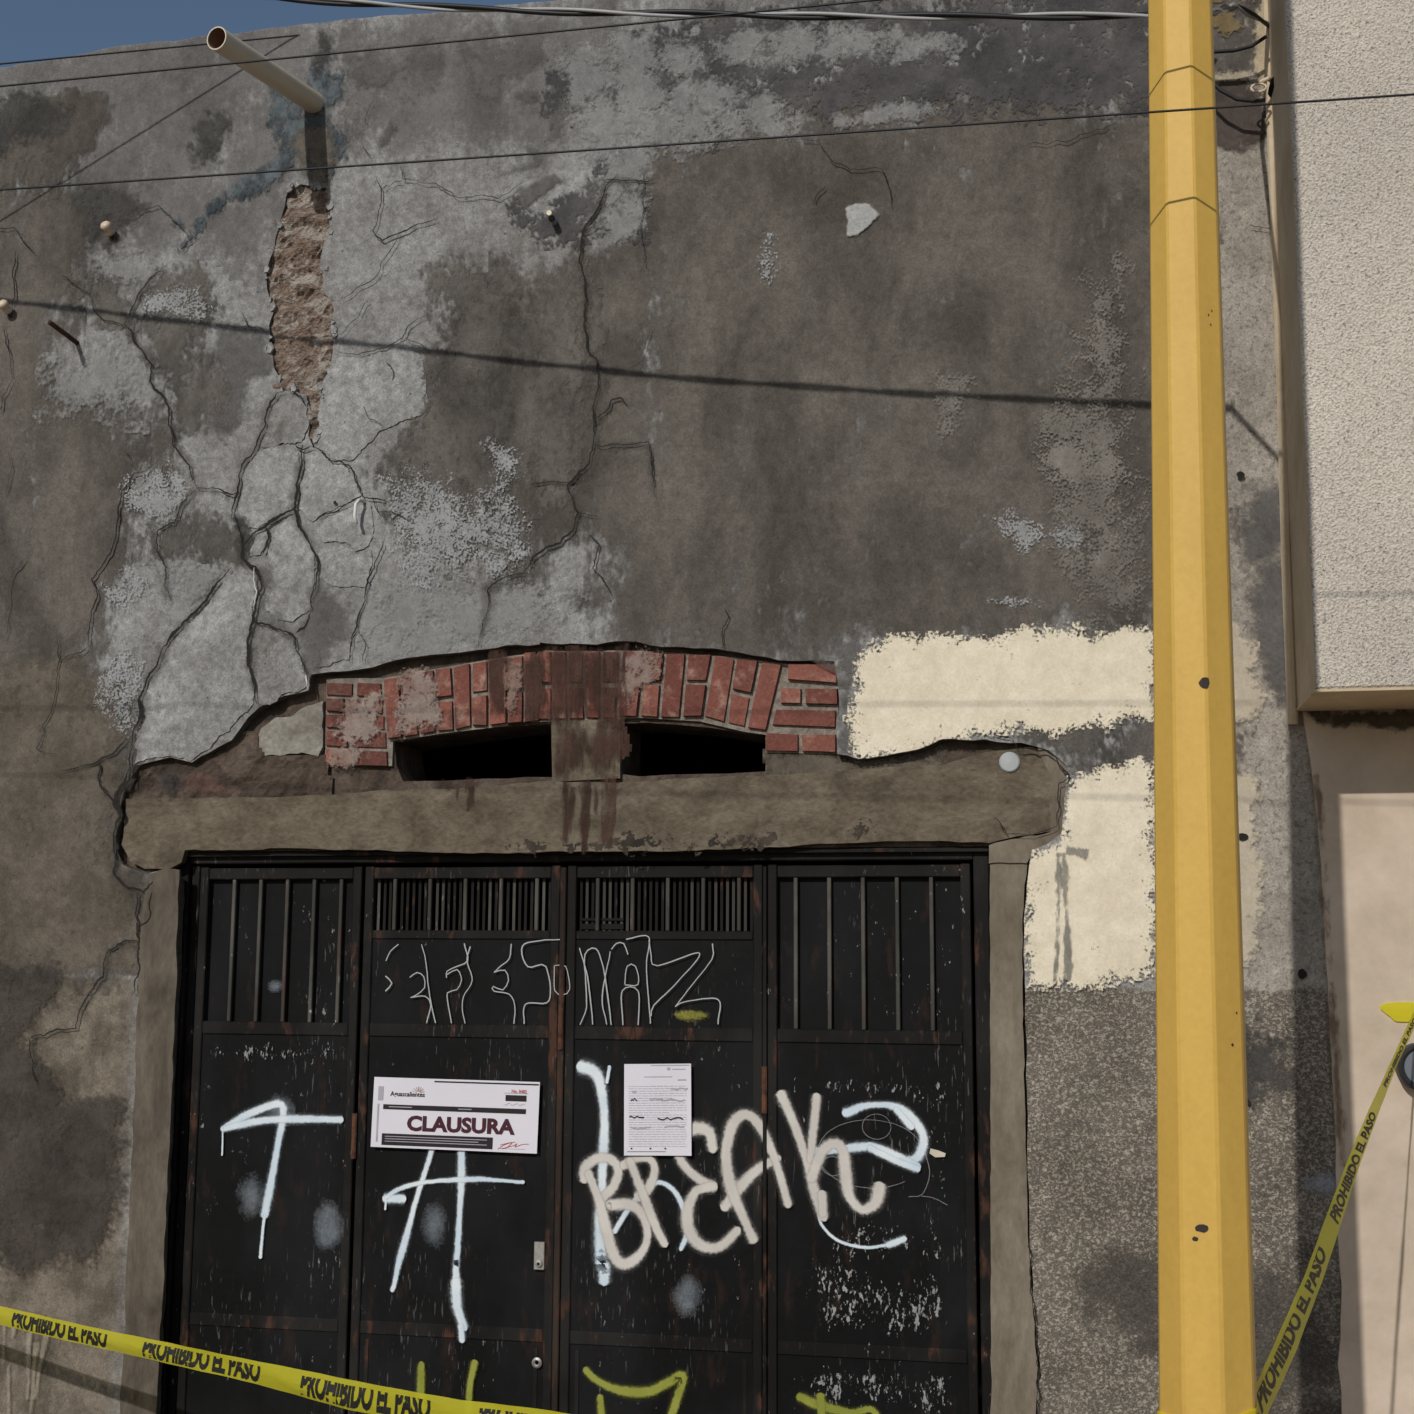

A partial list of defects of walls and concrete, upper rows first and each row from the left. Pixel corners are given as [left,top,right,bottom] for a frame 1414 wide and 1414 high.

crack [0,227,35,409]
spalling [263,181,338,446]
crack [339,103,524,381]
crack [478,173,655,648]
crack [27,205,407,1089]
rust [486,649,507,714]
peeling [502,661,524,714]
damp [0,0,1154,1277]
rust [523,641,632,854]
peeling [619,644,661,705]
peeling [843,621,1154,759]
peeling [1024,755,1156,992]